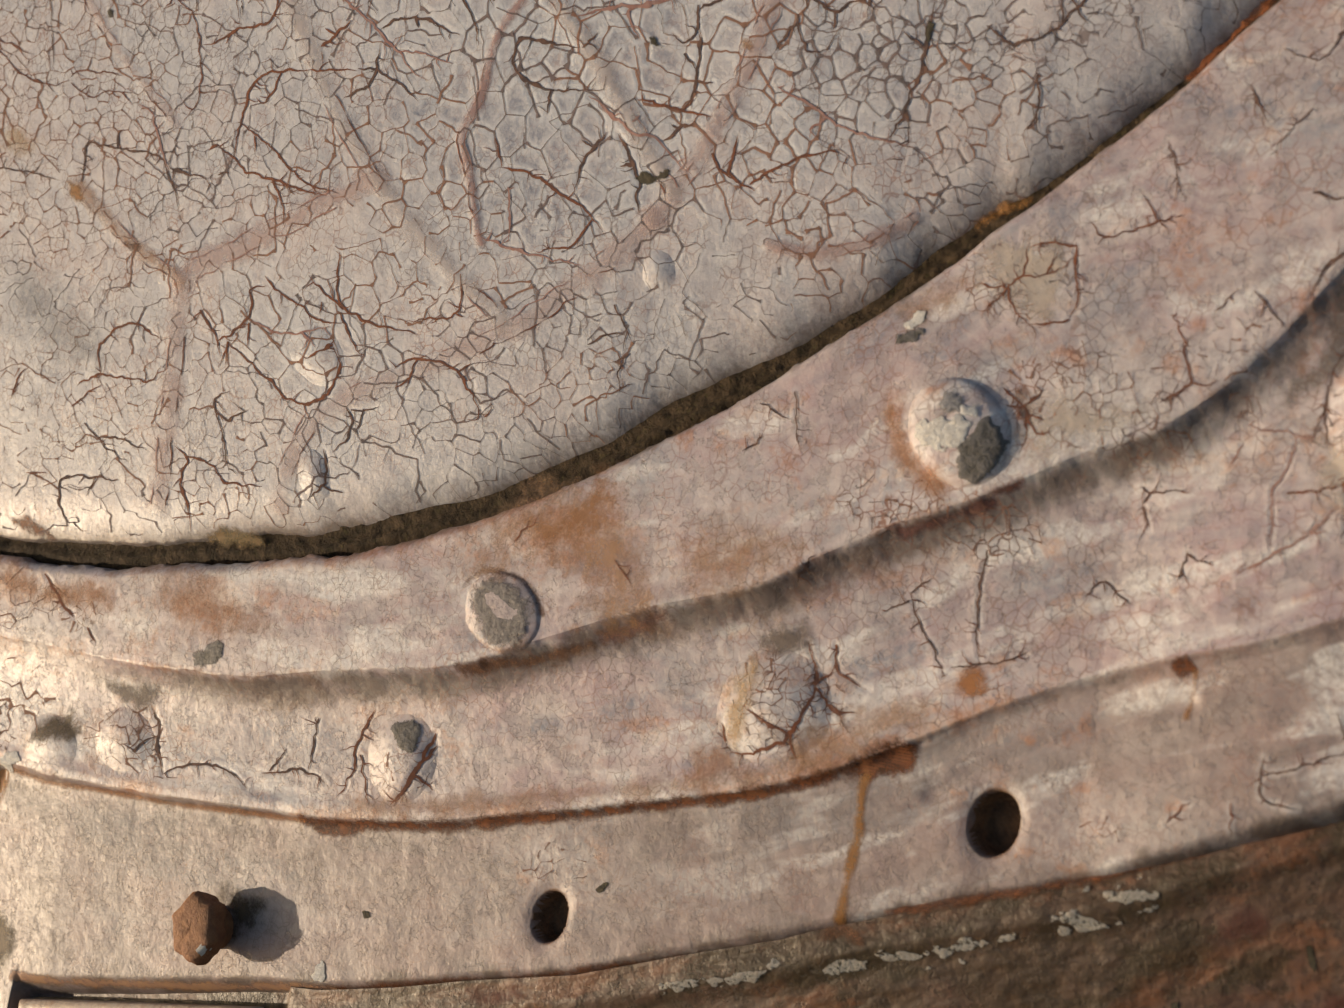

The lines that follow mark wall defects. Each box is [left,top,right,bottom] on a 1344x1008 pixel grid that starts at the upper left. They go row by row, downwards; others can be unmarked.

crack [0,0,1344,586]
corrosion [887,405,944,495]
peeling [914,392,1011,484]
crack [836,474,1042,703]
crack [1084,576,1131,607]
crack [0,567,96,750]
peeling [193,640,223,666]
corrosion [1171,655,1197,678]
peeling [391,719,421,753]
corrosion [9,740,1344,1008]
peeling [1082,877,1159,913]
peeling [822,933,1016,975]